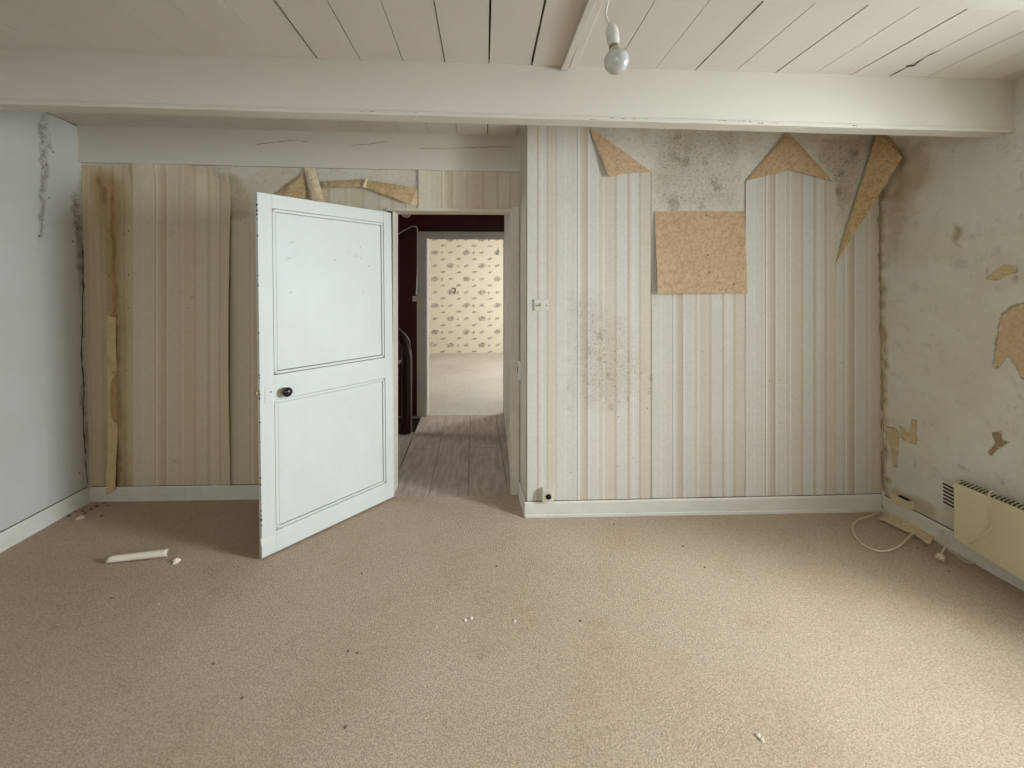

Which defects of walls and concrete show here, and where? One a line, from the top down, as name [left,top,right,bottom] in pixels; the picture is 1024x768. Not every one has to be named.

peeling [992,304,1024,378]
peeling [884,420,916,466]
peeling [989,431,1007,454]